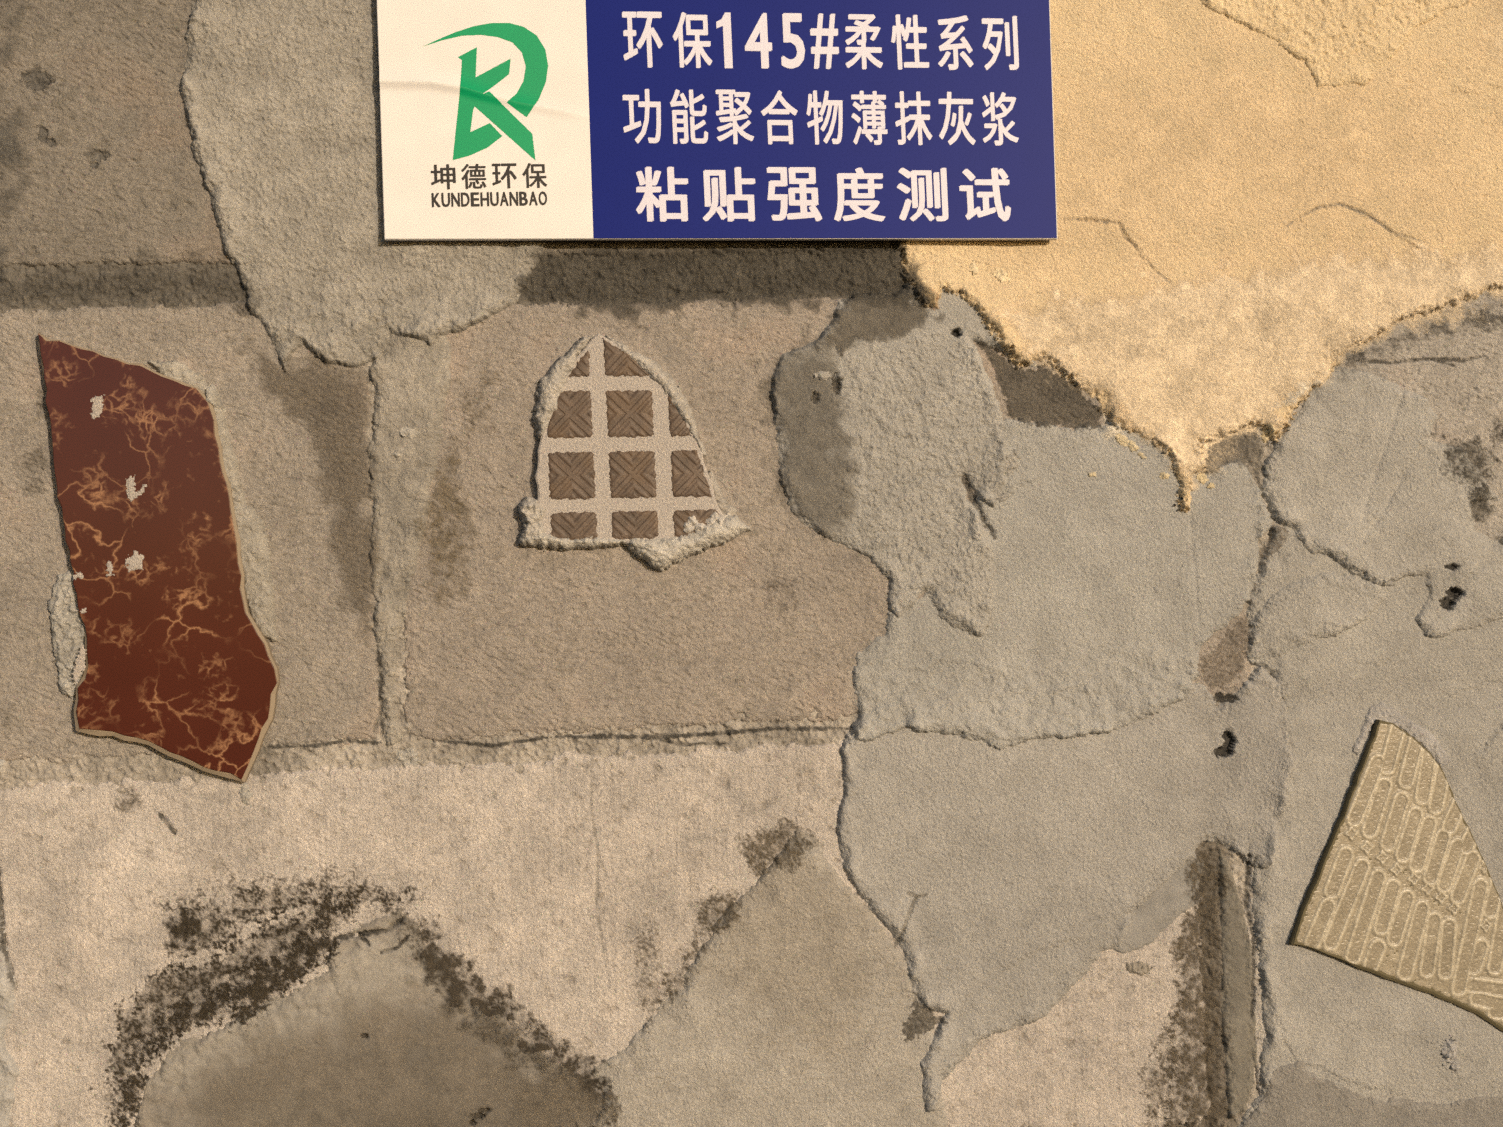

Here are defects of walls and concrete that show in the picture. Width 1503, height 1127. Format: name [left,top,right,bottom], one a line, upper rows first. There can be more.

spalling [978,337,1102,430]
spalling [1205,423,1276,490]
spalling [902,1002,947,1041]